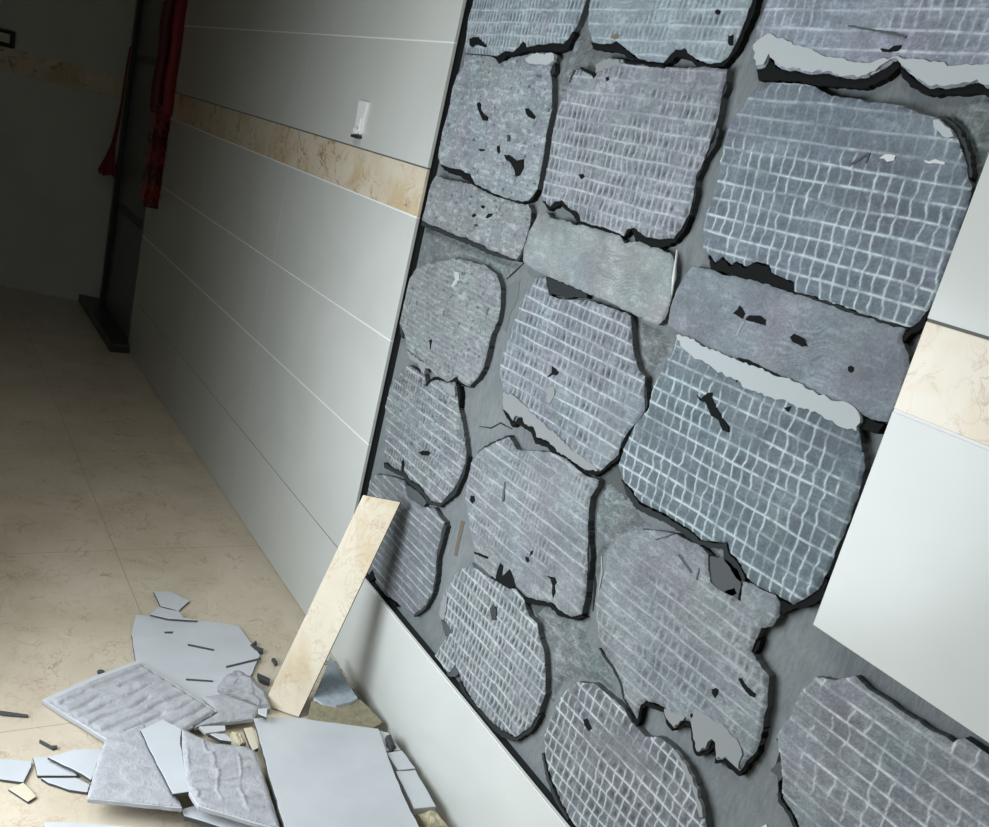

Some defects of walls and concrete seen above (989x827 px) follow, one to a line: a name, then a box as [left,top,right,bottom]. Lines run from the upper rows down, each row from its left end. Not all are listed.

spalling [469,37,488,47]
hole [504,155,524,177]
spalling [697,393,730,432]
spalling [406,485,430,507]
spalling [472,563,516,589]
spalling [709,556,743,599]
spalling [770,761,783,781]